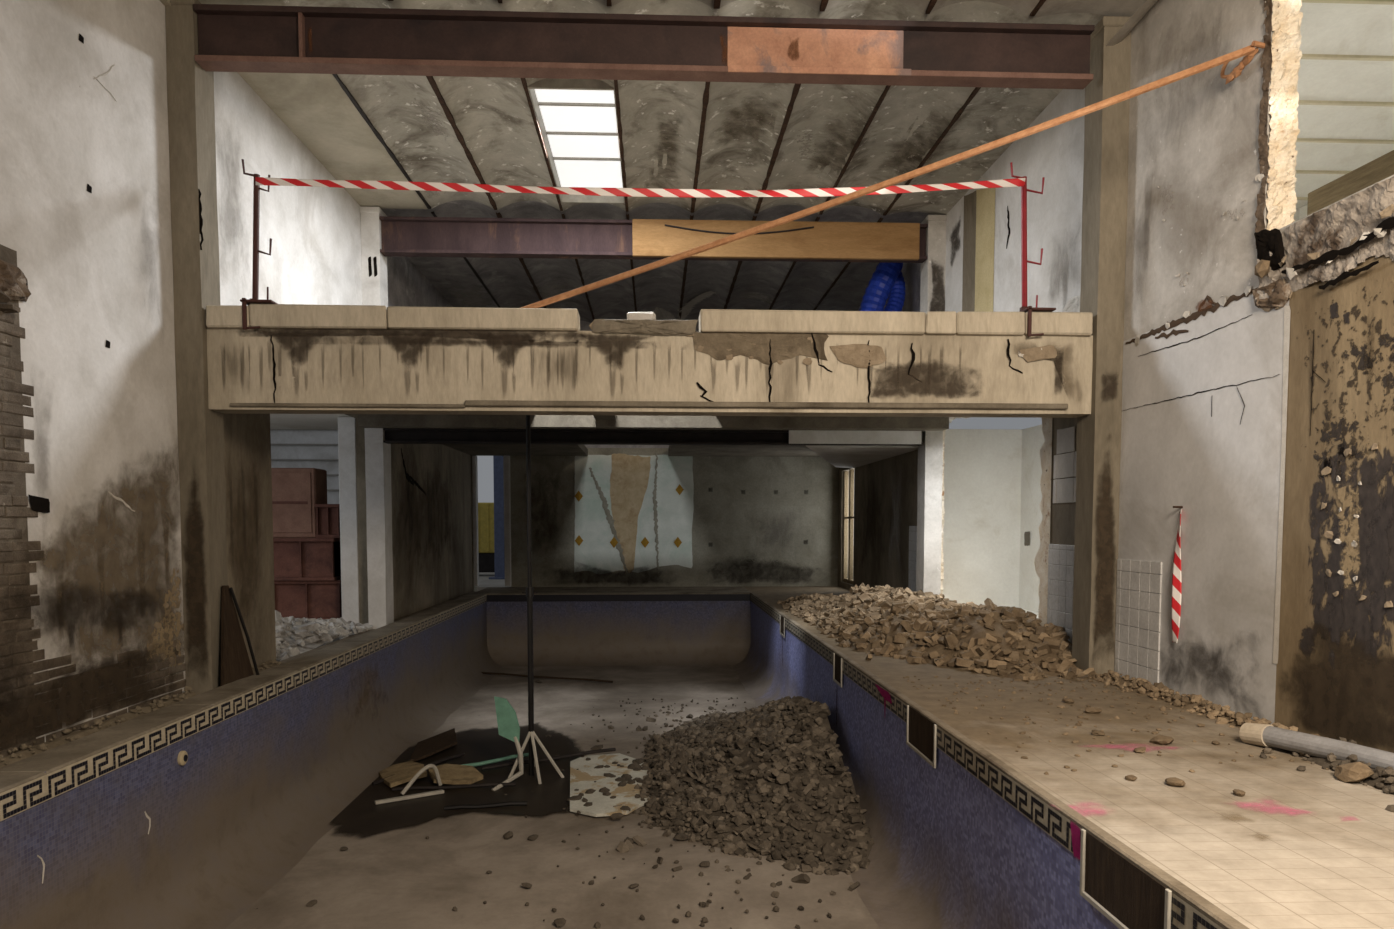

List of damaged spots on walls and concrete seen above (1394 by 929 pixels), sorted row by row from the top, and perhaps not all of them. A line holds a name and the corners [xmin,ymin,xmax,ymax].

corrosion [788,41,799,59]
spalling [1222,0,1394,324]
water stain [256,328,644,366]
crack [766,339,774,402]
crack [811,333,833,372]
crack [865,340,873,403]
crack [907,343,915,374]
water stain [873,362,978,397]
flaking render [0,259,79,702]
water stain [1293,287,1394,749]
peeling [1334,473,1362,590]
water stain [0,456,207,750]